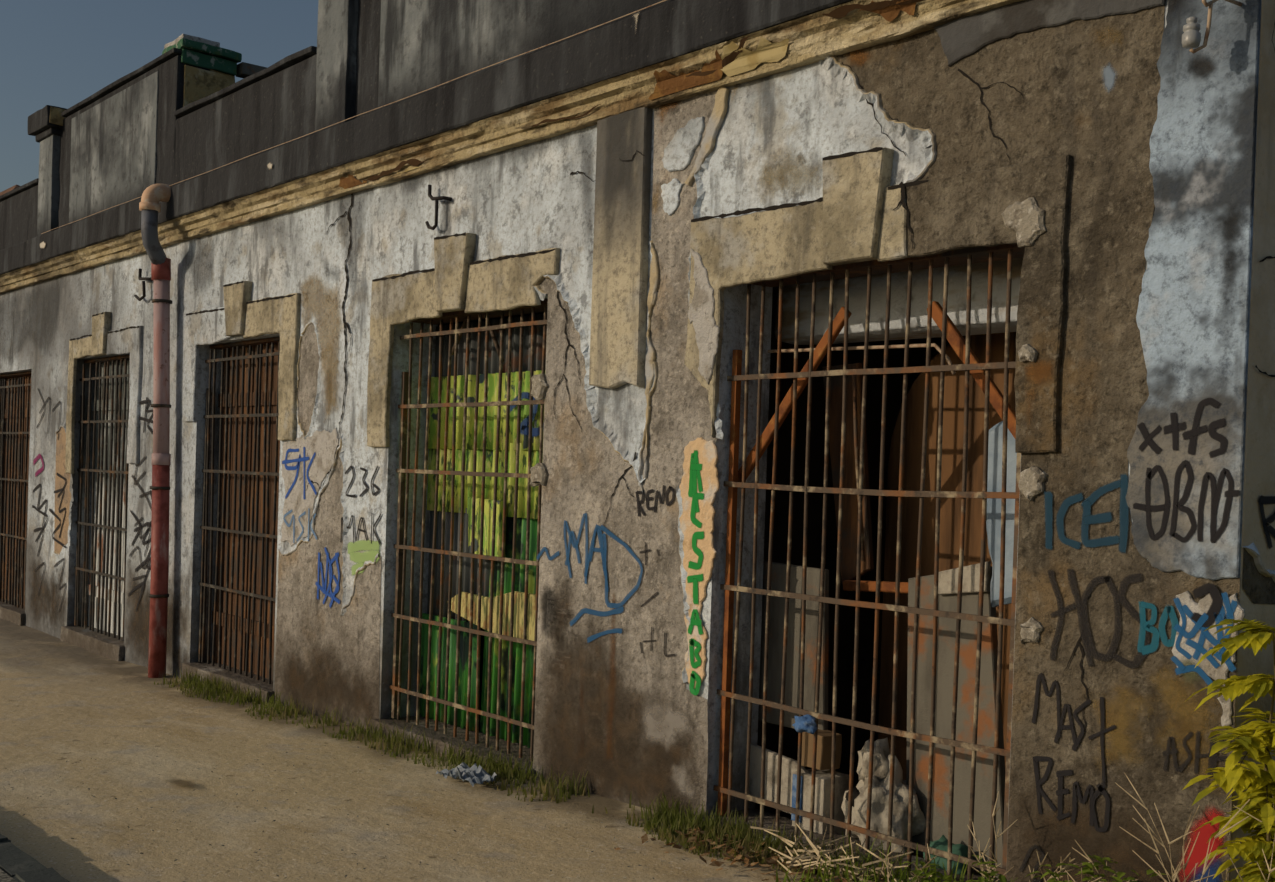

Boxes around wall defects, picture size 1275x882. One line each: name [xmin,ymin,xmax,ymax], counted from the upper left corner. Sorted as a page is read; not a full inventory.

crack [958,68,1024,166]
spalling [274,428,381,729]
crack [306,159,427,525]
crack [553,291,582,432]
damp [542,589,687,816]
spalling [533,37,789,820]
corrosion [843,580,908,593]
spalling [817,5,1275,882]